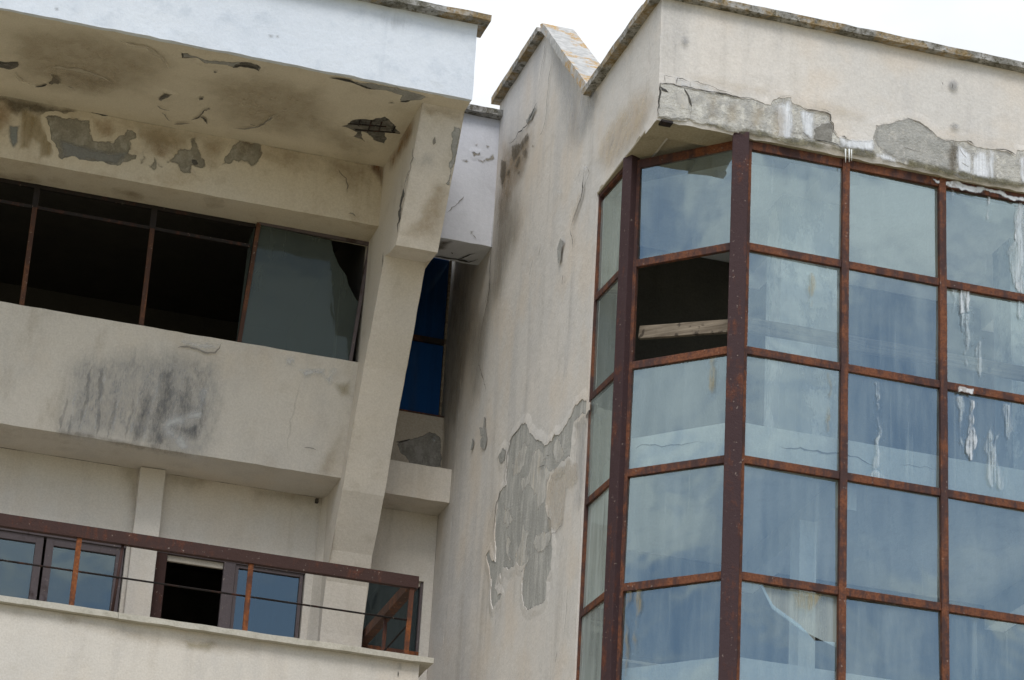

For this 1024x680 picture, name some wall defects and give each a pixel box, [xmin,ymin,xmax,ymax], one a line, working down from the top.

leakage [2,98,71,154]
flaking render [38,107,272,181]
spalling [332,78,435,146]
crack [511,41,552,143]
flaking render [657,75,1024,183]
flaking render [392,424,444,468]
flaking render [485,389,591,621]